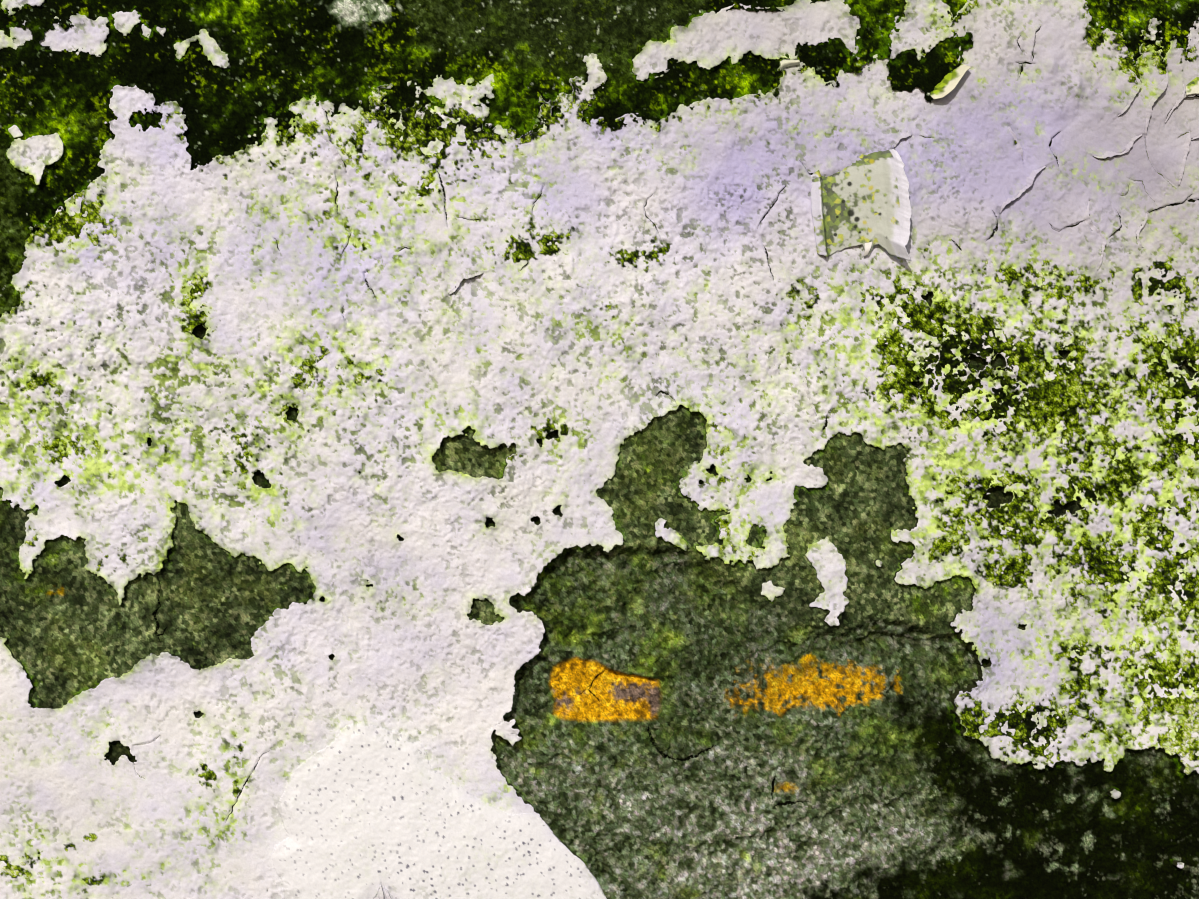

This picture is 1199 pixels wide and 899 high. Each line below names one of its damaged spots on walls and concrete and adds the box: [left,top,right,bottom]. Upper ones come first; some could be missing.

crack [1017,26,1041,77]
peeling [0,0,973,318]
crack [951,126,1061,251]
crack [1049,68,1199,271]
spalling [192,323,207,339]
spalling [967,354,1003,370]
peeling [432,426,516,479]
peeling [0,487,325,708]
spalling [467,405,988,899]